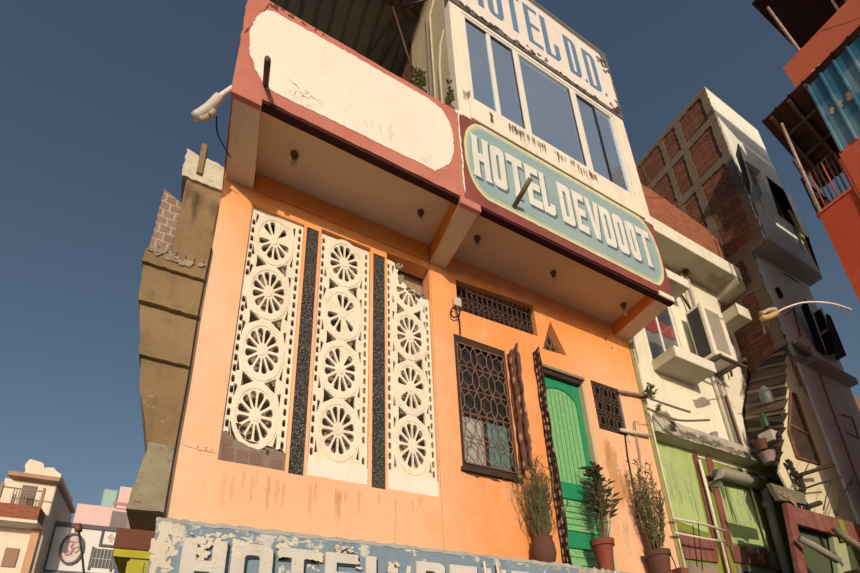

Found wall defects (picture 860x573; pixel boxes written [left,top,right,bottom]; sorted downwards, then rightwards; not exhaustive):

damp [533,140,598,182]
peeling [149,521,324,573]
peeling [334,544,362,570]
peeling [387,561,411,573]
peeling [525,563,611,573]